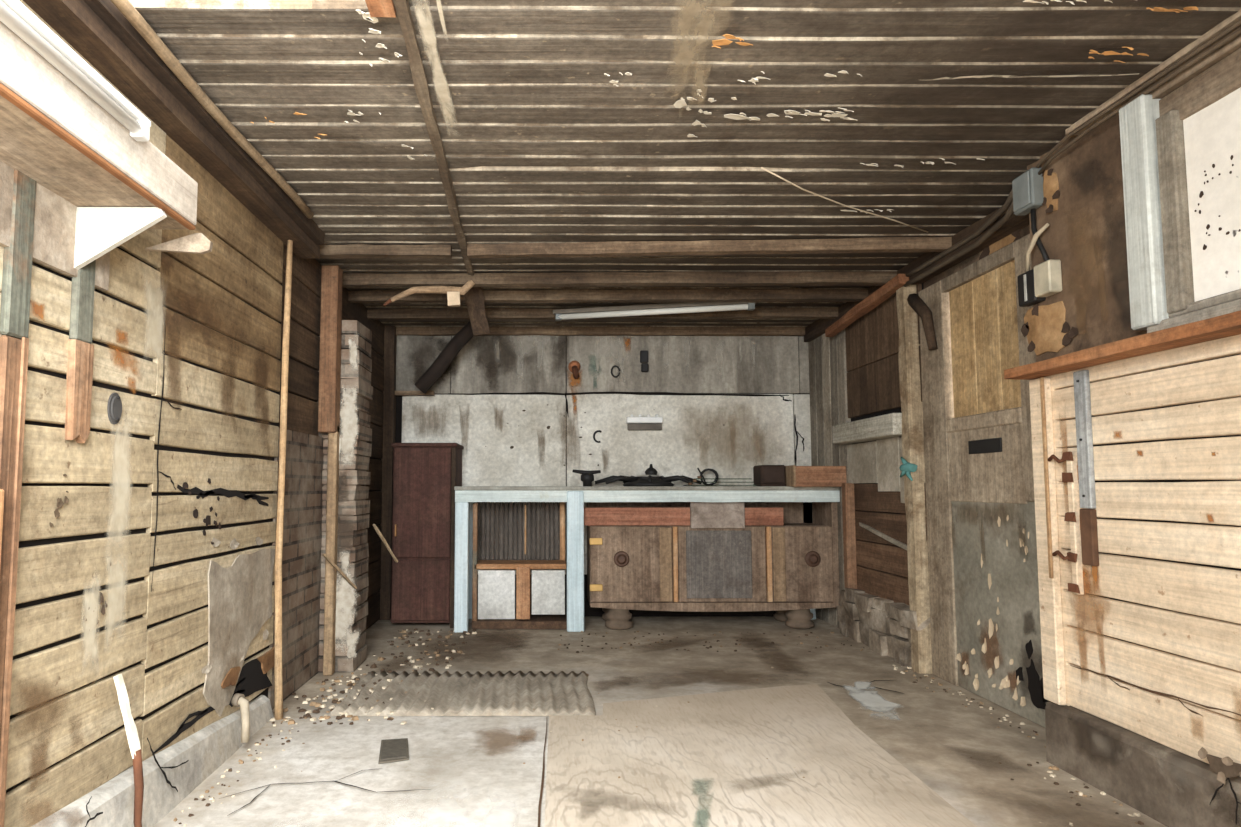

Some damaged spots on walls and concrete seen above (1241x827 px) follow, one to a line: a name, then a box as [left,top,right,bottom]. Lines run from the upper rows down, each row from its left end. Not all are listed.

peeling [712,34,753,49]
peeling [1088,47,1149,63]
peeling [674,89,857,137]
water stain [477,336,523,384]
crack [151,314,269,592]
corrosion [1083,566,1098,590]